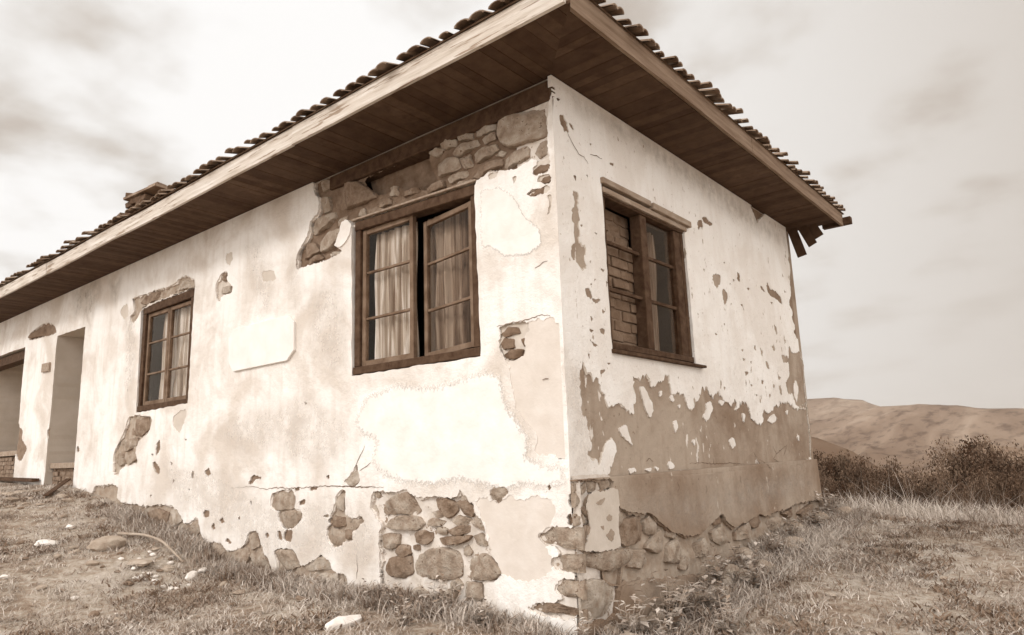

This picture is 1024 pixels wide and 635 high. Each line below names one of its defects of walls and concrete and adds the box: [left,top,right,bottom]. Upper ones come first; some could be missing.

spalling [297,79,613,271]
flaking render [121,276,195,323]
flaking render [28,323,56,340]
flaking render [17,428,27,460]
peeling [326,262,821,623]
spalling [93,415,358,585]
crack [237,483,383,491]